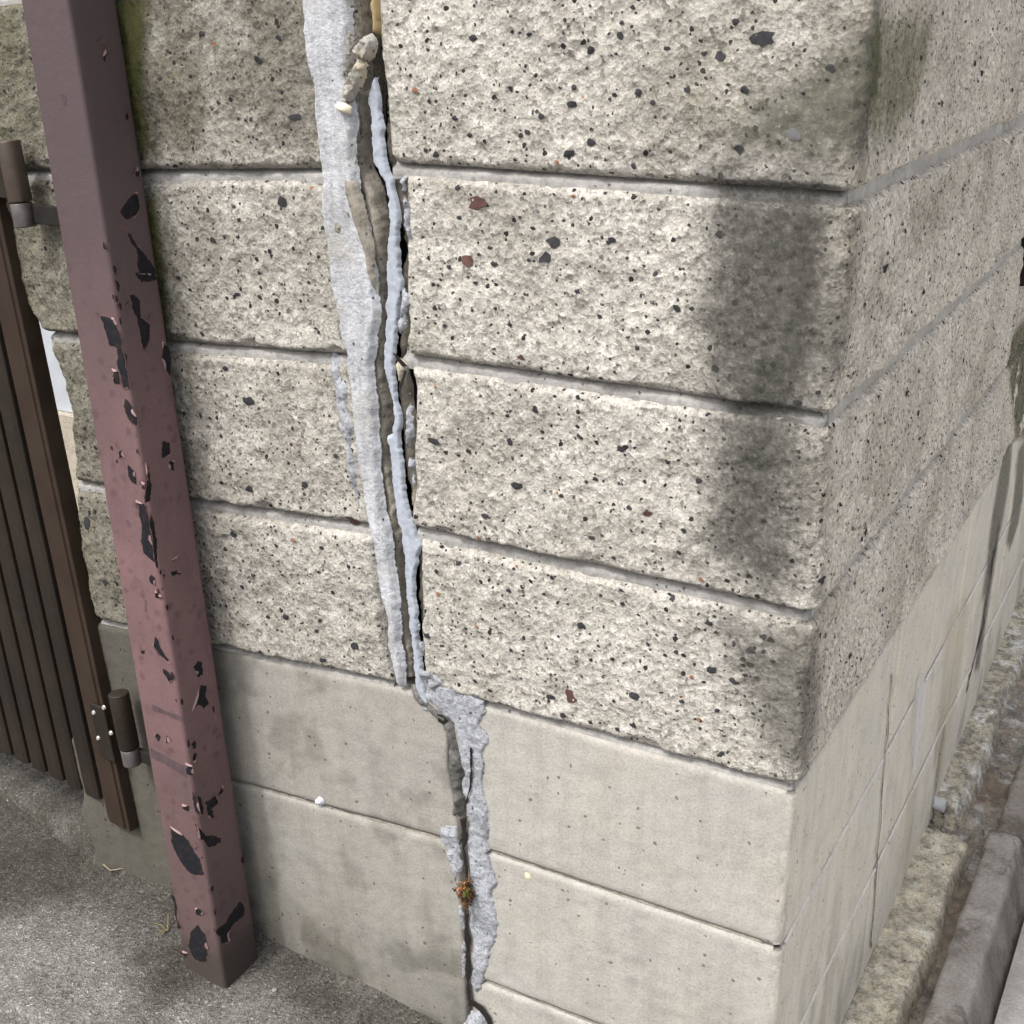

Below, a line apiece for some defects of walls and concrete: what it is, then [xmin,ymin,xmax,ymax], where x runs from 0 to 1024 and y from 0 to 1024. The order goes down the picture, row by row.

crack [355,0,426,677]
damp [702,173,821,581]
damp [976,443,1024,666]
crack [437,714,448,725]
crack [460,748,492,1024]
crack [871,673,893,947]